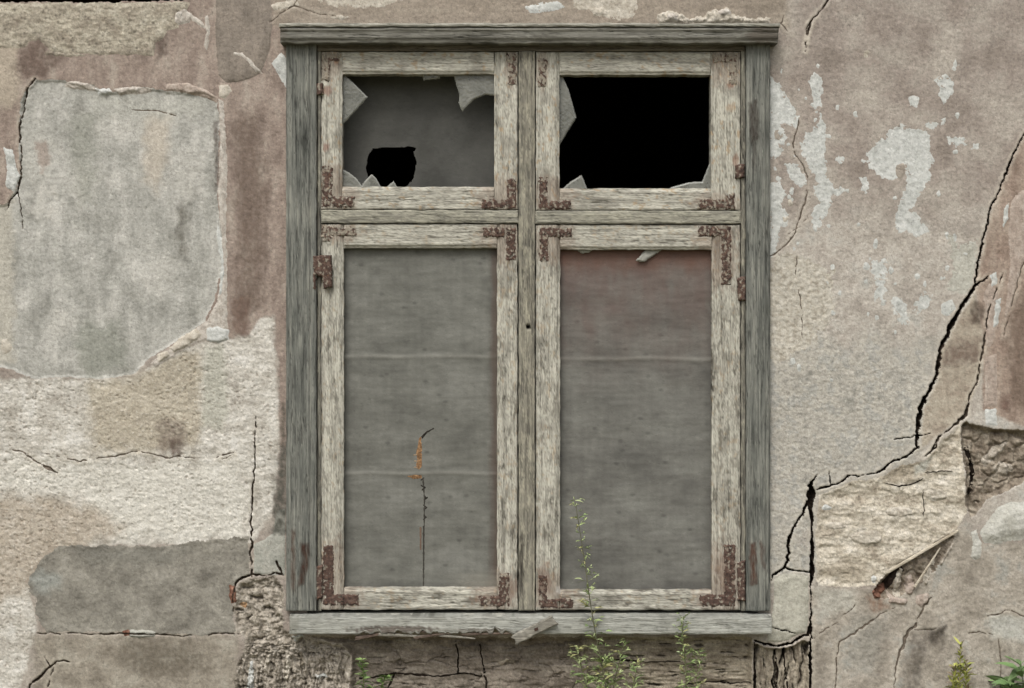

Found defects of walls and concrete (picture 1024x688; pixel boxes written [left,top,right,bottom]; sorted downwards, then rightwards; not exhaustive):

crack [7,78,36,228]
crack [12,417,284,688]
peeling [0,0,299,380]
spalling [229,190,1024,688]
peeling [770,59,979,371]
crack [754,119,1024,688]